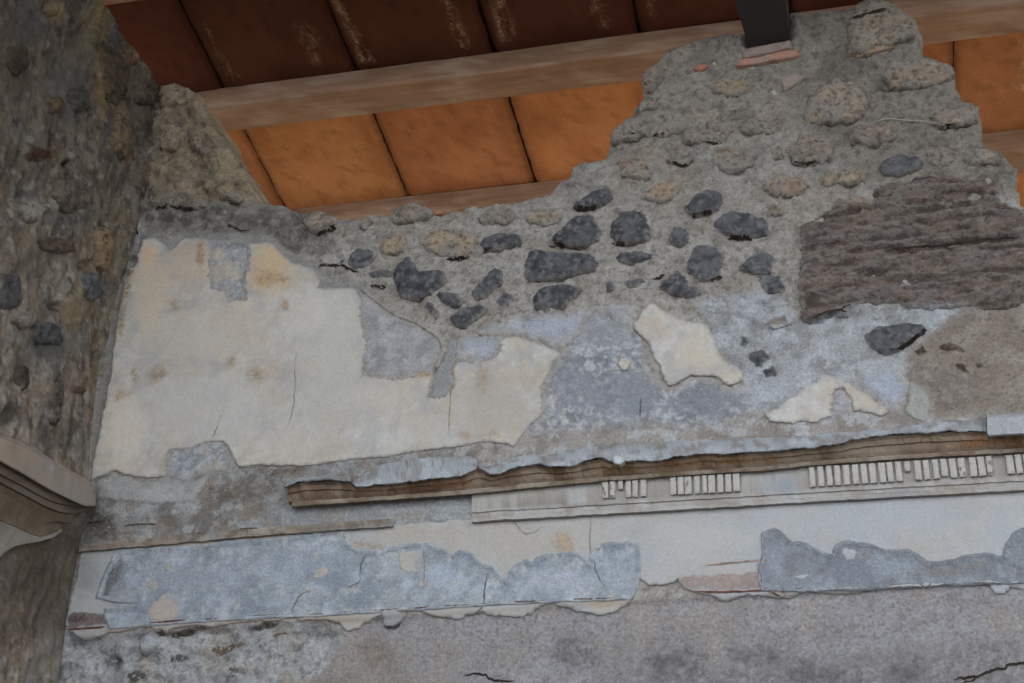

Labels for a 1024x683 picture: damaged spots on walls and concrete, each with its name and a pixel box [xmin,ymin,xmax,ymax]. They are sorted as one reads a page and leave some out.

peeling [207,238,252,303]
crack [288,352,297,425]
peeling [164,440,236,482]
peeling [757,527,1024,593]
spalling [113,656,147,683]
spalling [212,643,246,656]
crack [954,661,1024,683]